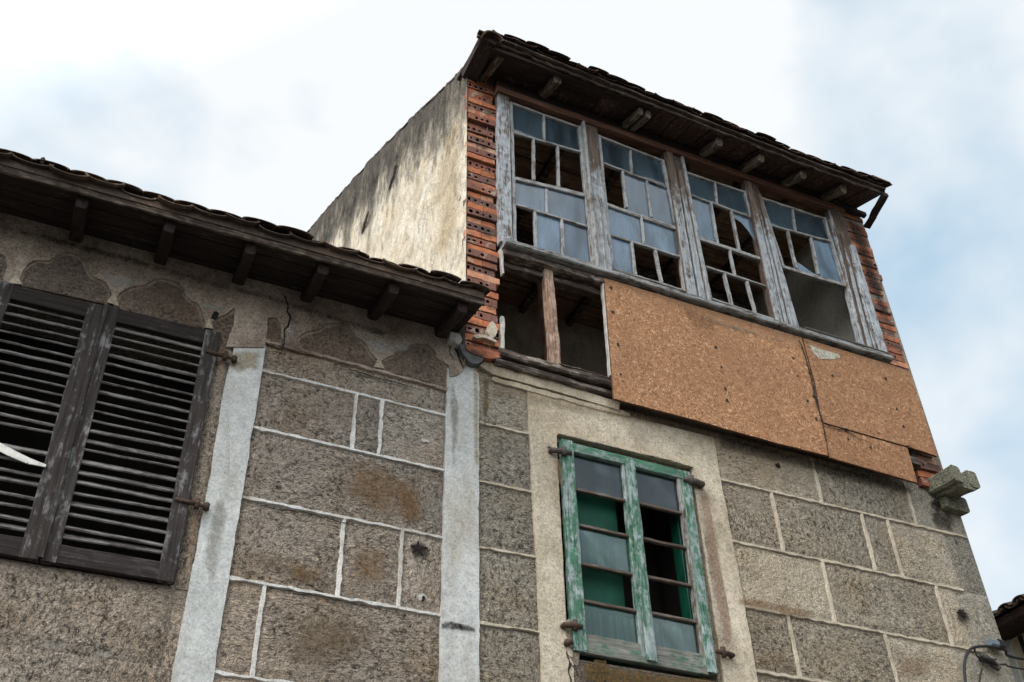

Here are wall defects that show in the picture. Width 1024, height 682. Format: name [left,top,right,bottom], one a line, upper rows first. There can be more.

crack [279,295,299,355]